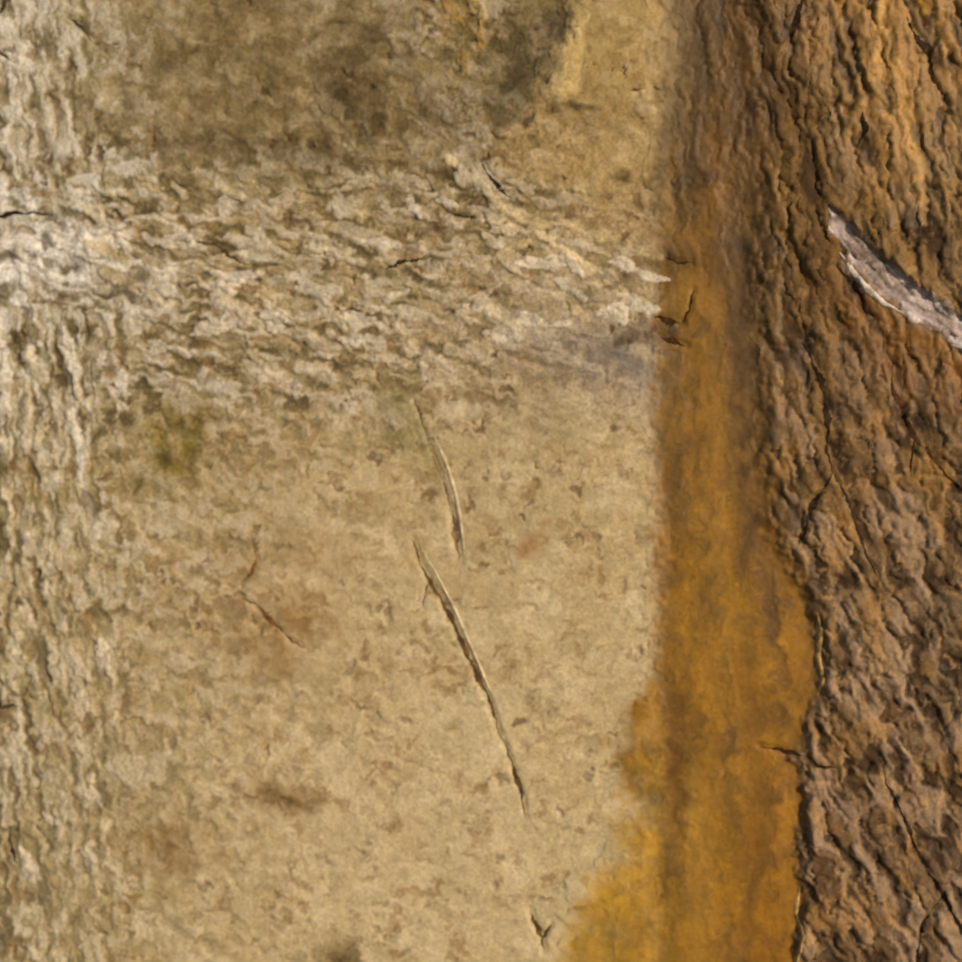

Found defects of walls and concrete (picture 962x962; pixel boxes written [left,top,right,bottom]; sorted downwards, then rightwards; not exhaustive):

spalling [826,201,962,353]
crack [414,397,465,560]
rust [508,517,555,567]
rust [536,0,962,962]
crack [798,341,877,575]
crack [891,362,962,494]
crack [414,542,526,815]
crack [762,746,837,770]
crack [878,754,962,962]